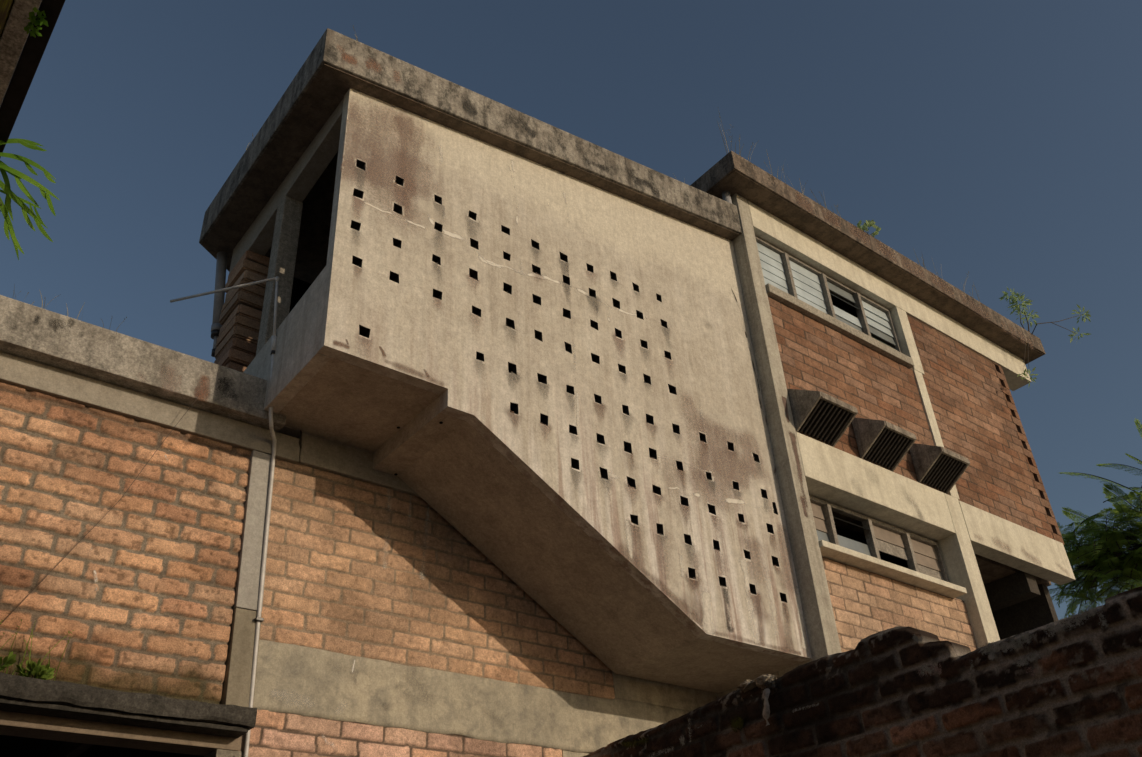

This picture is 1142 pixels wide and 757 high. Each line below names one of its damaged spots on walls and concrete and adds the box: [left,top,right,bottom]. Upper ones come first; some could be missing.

crack [363,201,590,297]
water stain [620,520,647,574]
water stain [658,544,733,634]
water stain [741,543,807,655]